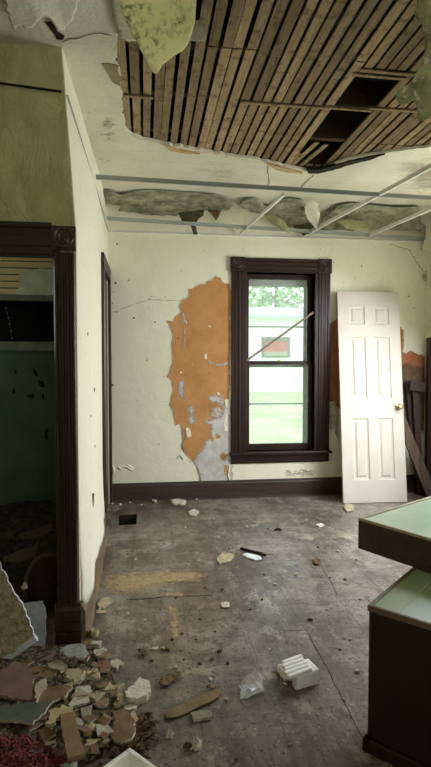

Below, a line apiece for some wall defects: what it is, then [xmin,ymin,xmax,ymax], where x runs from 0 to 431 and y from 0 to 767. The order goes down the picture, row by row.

spalling [125,133,307,174]
peeling [166,275,233,481]
peeling [329,319,340,440]
peeling [400,327,425,368]